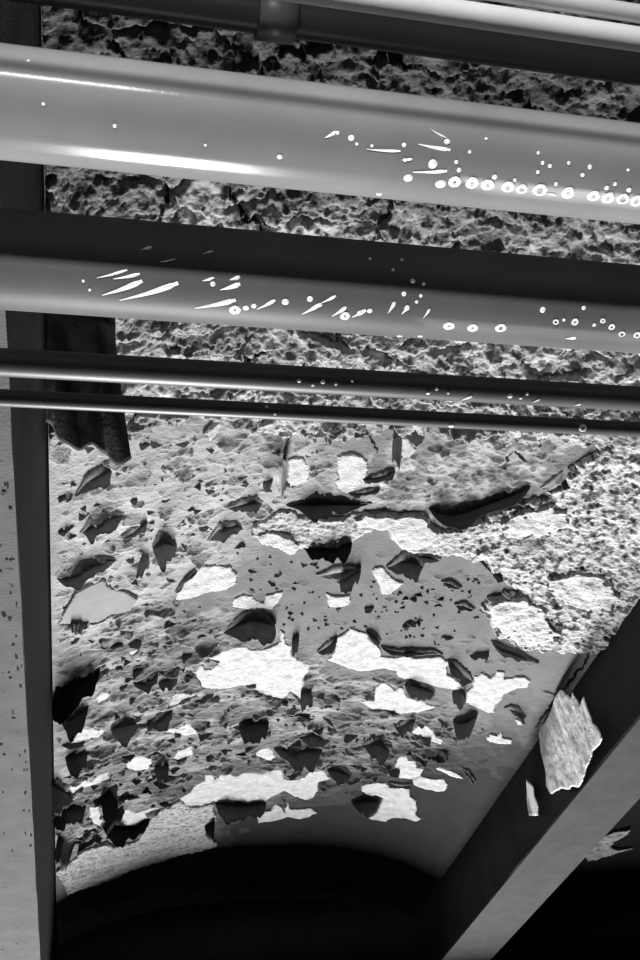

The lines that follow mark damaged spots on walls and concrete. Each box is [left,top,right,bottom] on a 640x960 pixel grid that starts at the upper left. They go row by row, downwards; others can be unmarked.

spalling [467,0,640,26]
spalling [42,5,640,123]
spalling [45,165,640,265]
spalling [45,313,640,386]
spalling [45,379,640,422]
spalling [46,409,640,895]